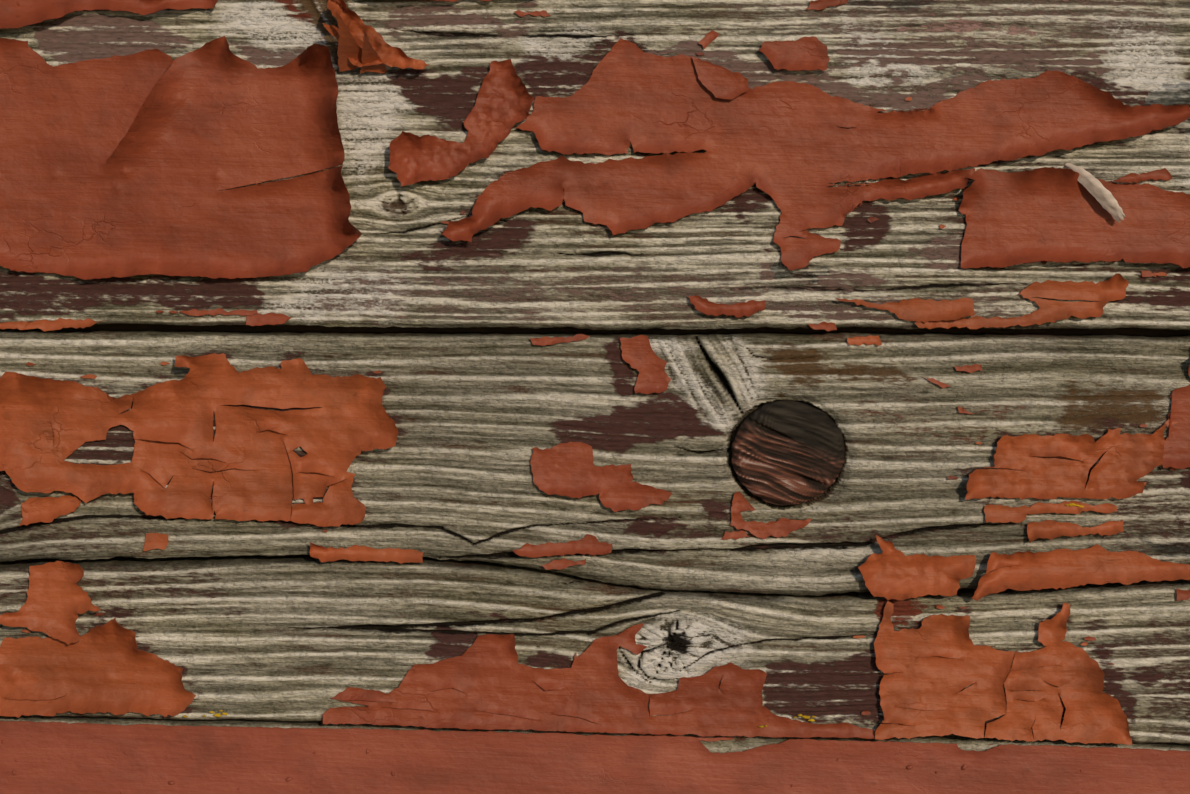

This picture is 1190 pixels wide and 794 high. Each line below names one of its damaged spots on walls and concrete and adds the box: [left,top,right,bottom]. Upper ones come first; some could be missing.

peeling [806,0,848,10]
peeling [0,0,429,280]
peeling [388,30,1190,329]
peeling [0,318,106,332]
peeling [156,308,292,326]
peeling [530,334,589,346]
peeling [808,321,882,346]
peeling [620,335,671,394]
crack [0,515,195,534]
peeling [0,353,1190,794]
crack [289,517,1029,683]